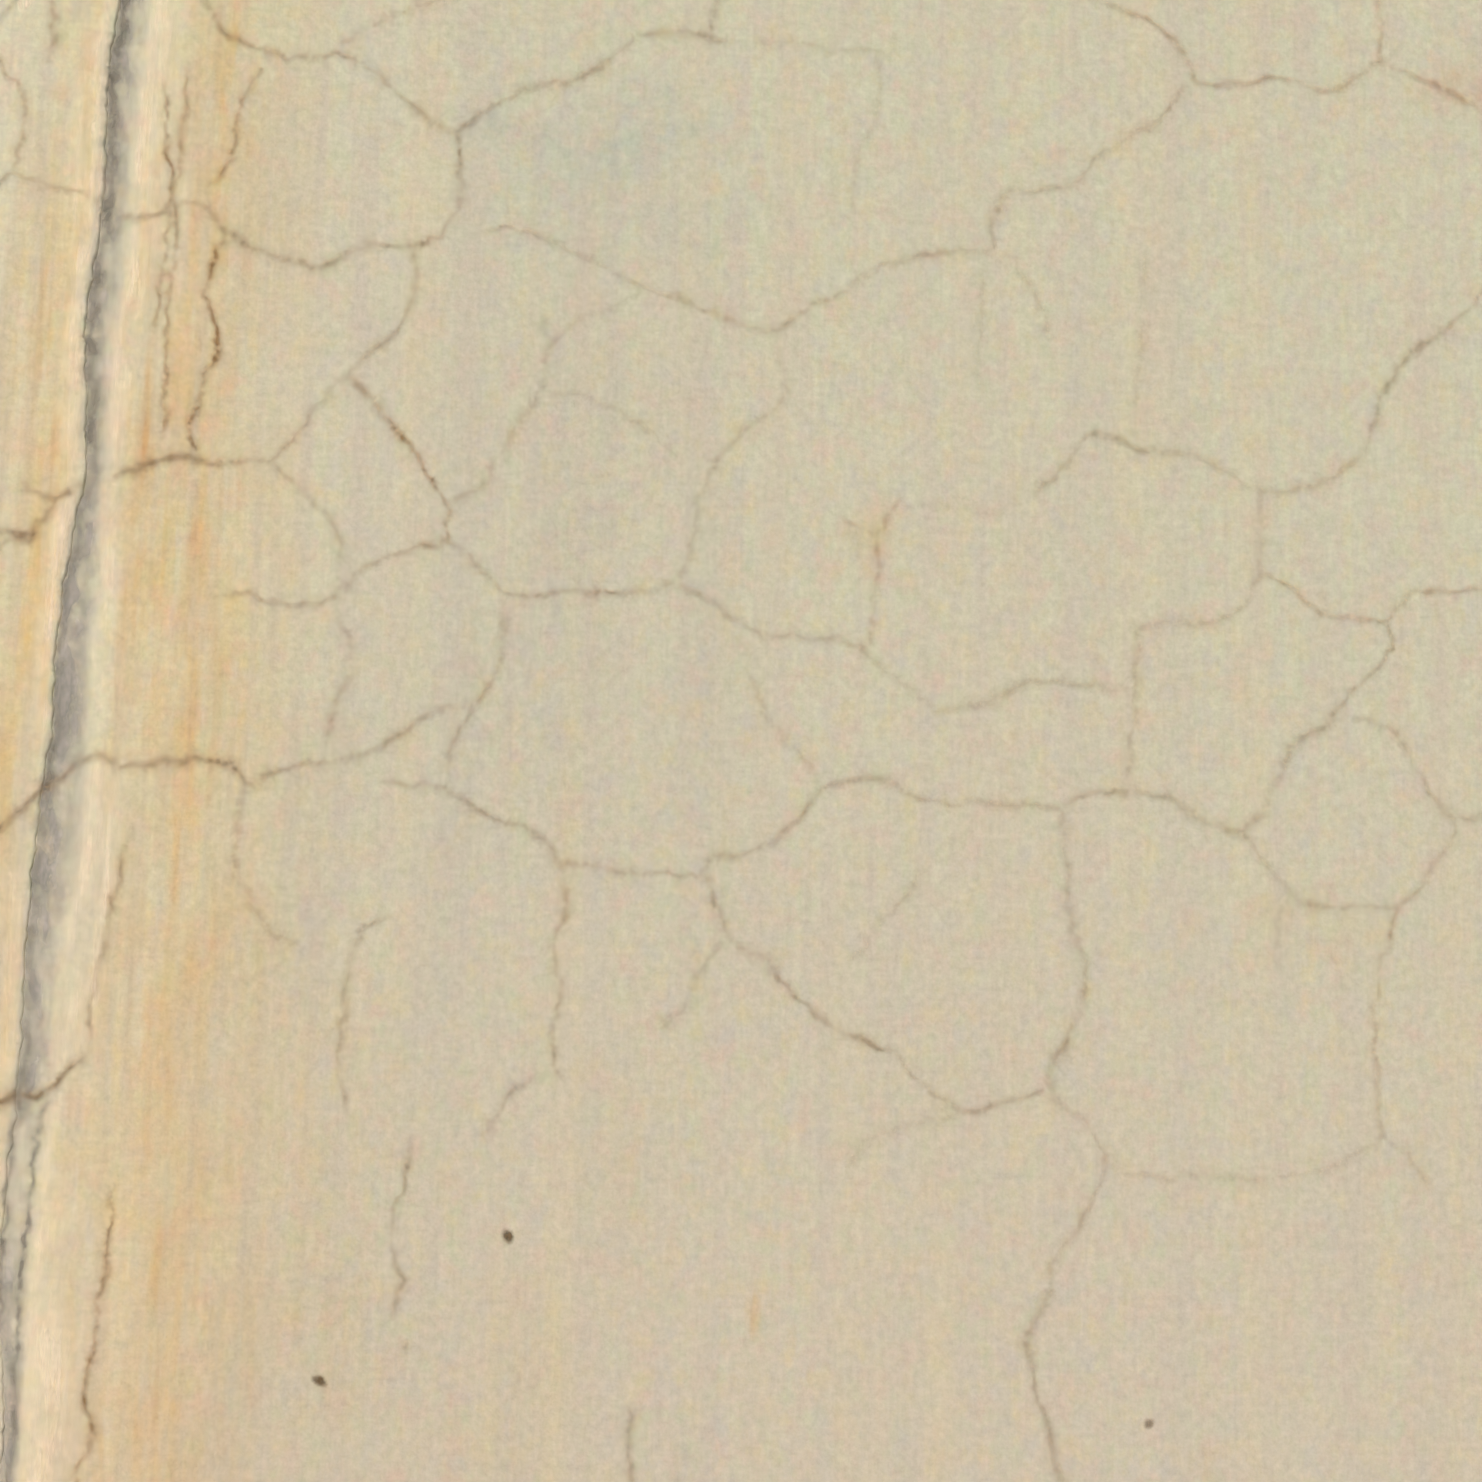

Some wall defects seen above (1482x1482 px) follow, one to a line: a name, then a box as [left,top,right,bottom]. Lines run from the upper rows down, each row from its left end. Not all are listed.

crack [209,249,219,362]
crack [0,0,133,1108]
crack [0,1148,36,1482]
crack [82,1358,93,1430]